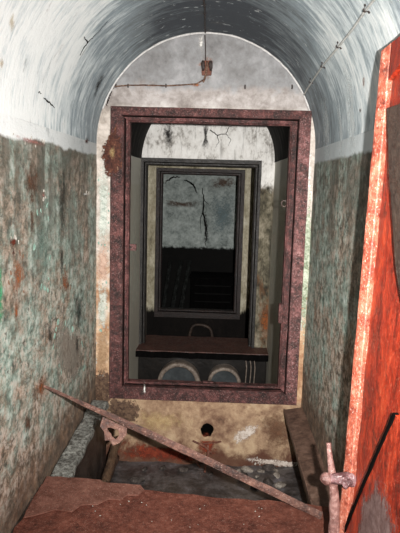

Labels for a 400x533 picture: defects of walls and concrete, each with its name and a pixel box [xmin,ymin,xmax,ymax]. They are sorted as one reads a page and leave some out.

crack [165,176,209,245]
water stain [234,426,256,443]
corrosion [123,442,192,463]